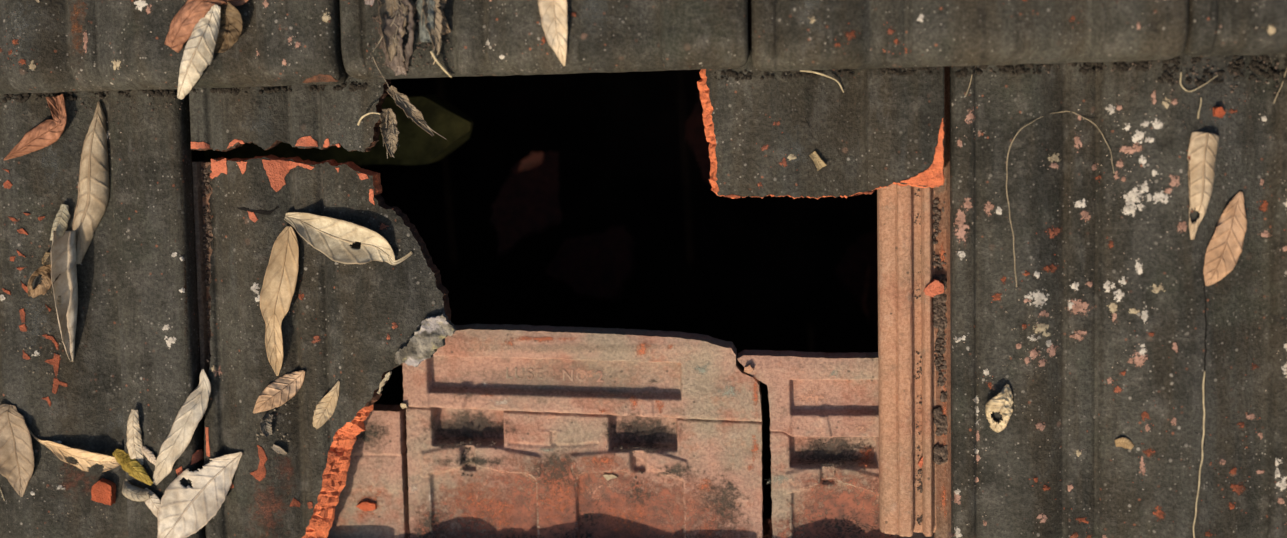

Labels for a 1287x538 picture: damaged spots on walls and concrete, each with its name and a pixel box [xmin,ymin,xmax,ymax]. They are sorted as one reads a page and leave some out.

spalling [697,22,945,199]
spalling [176,73,451,538]
peeling [923,279,944,297]